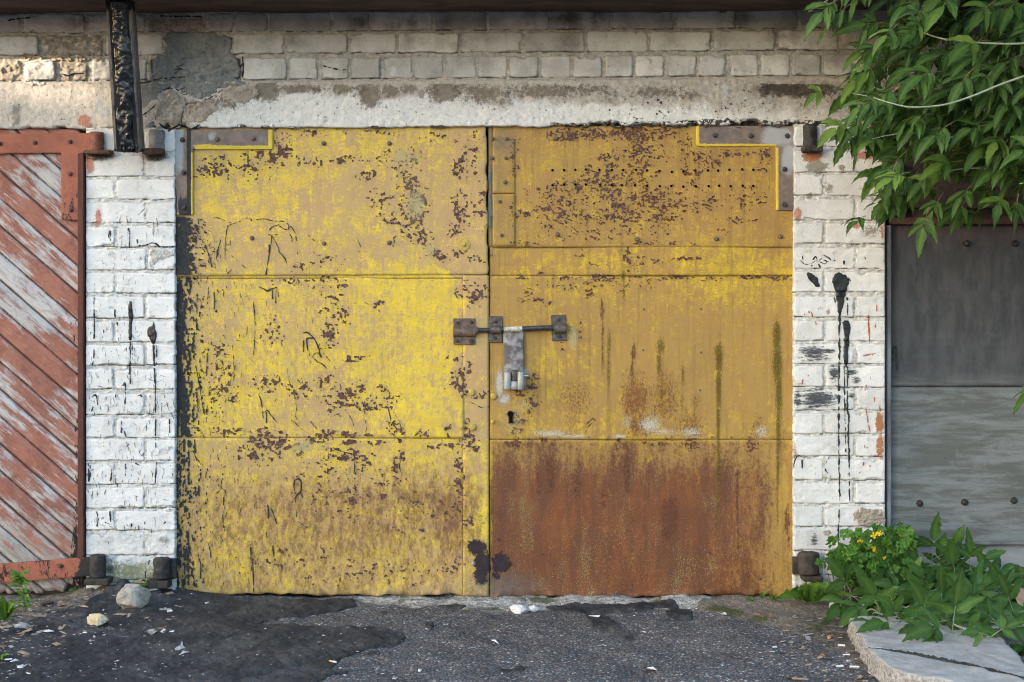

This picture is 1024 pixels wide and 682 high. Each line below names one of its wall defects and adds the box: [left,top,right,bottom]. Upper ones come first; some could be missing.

spalling [153,84,258,126]
leakage [181,90,239,120]
leakage [251,63,704,110]
peeling [193,125,493,263]
spalling [509,89,845,307]
peeling [271,254,353,349]
peeling [454,278,496,309]
peeling [191,340,489,540]
corrosion [618,369,703,498]
peeling [235,545,469,588]